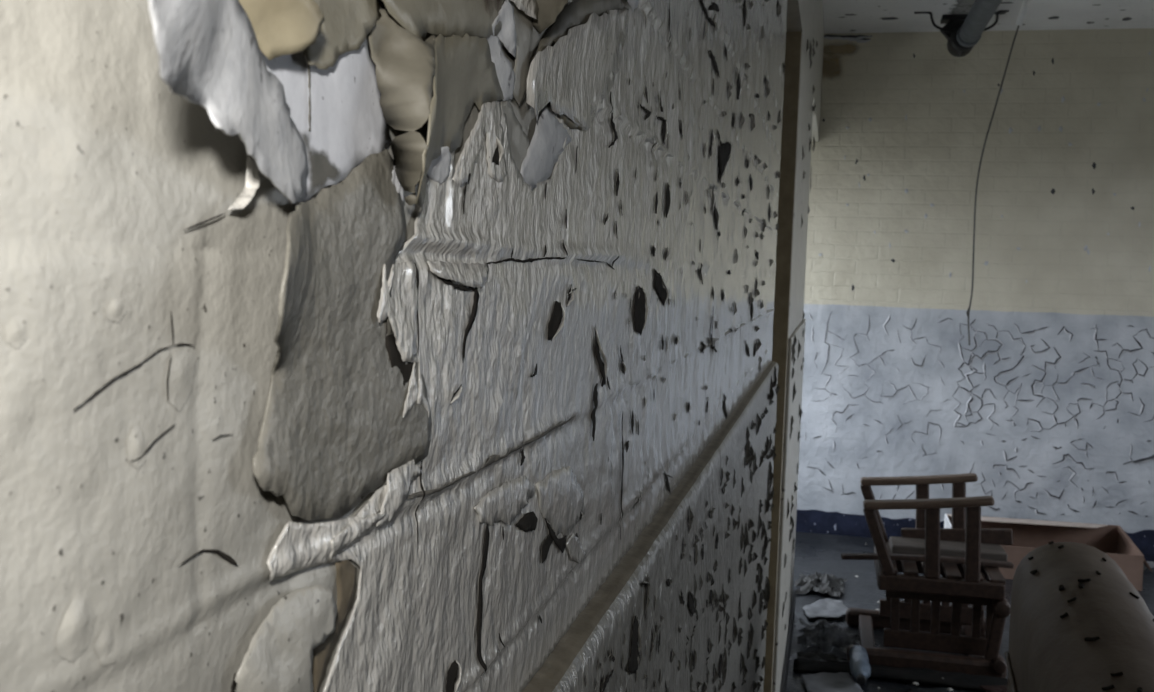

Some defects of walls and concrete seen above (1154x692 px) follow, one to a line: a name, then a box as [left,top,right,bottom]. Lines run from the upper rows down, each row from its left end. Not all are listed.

peeling [738,0,782,41]
peeling [801,85,825,228]
crack [73,311,194,461]
peeling [149,0,647,692]
crack [413,263,421,354]
crack [486,256,619,273]
peeling [585,12,805,692]
crack [805,311,1154,518]
crack [177,549,238,567]